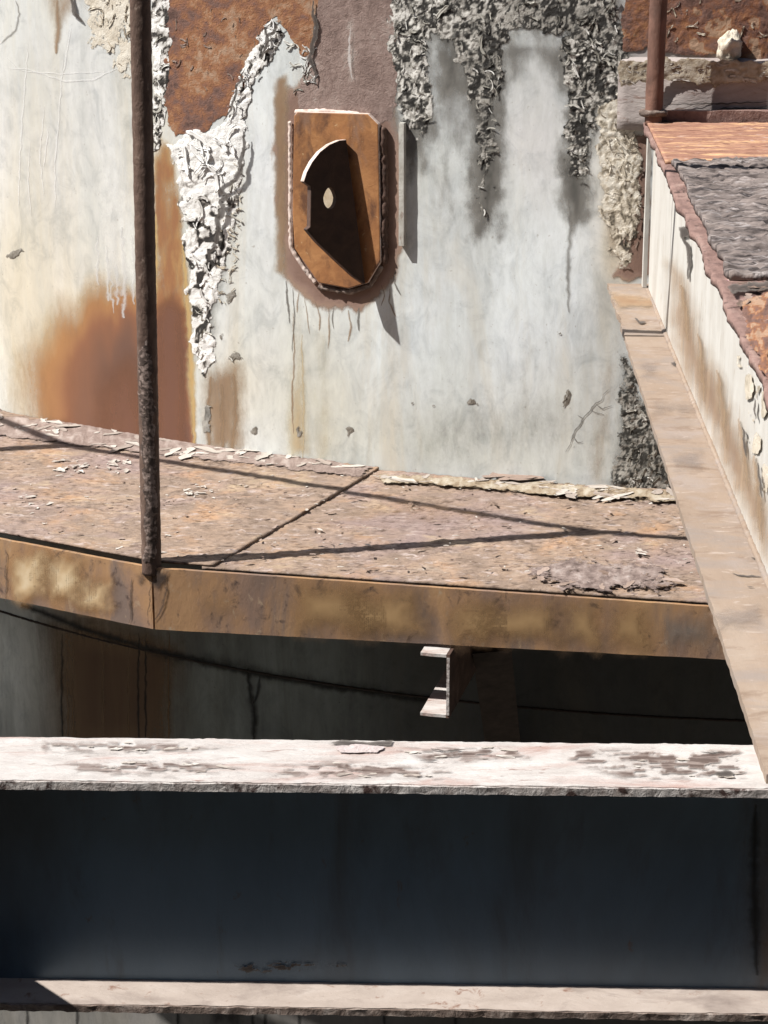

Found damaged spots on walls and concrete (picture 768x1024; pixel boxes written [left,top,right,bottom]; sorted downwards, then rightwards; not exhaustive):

peeling [664,57,768,87]
peeling [151,0,647,377]
rust [24,285,139,435]
rust [154,145,196,443]
peeling [0,340,675,563]
crack [566,389,611,451]
peeling [737,355,768,498]
rust [12,551,108,610]
spalling [524,544,693,595]